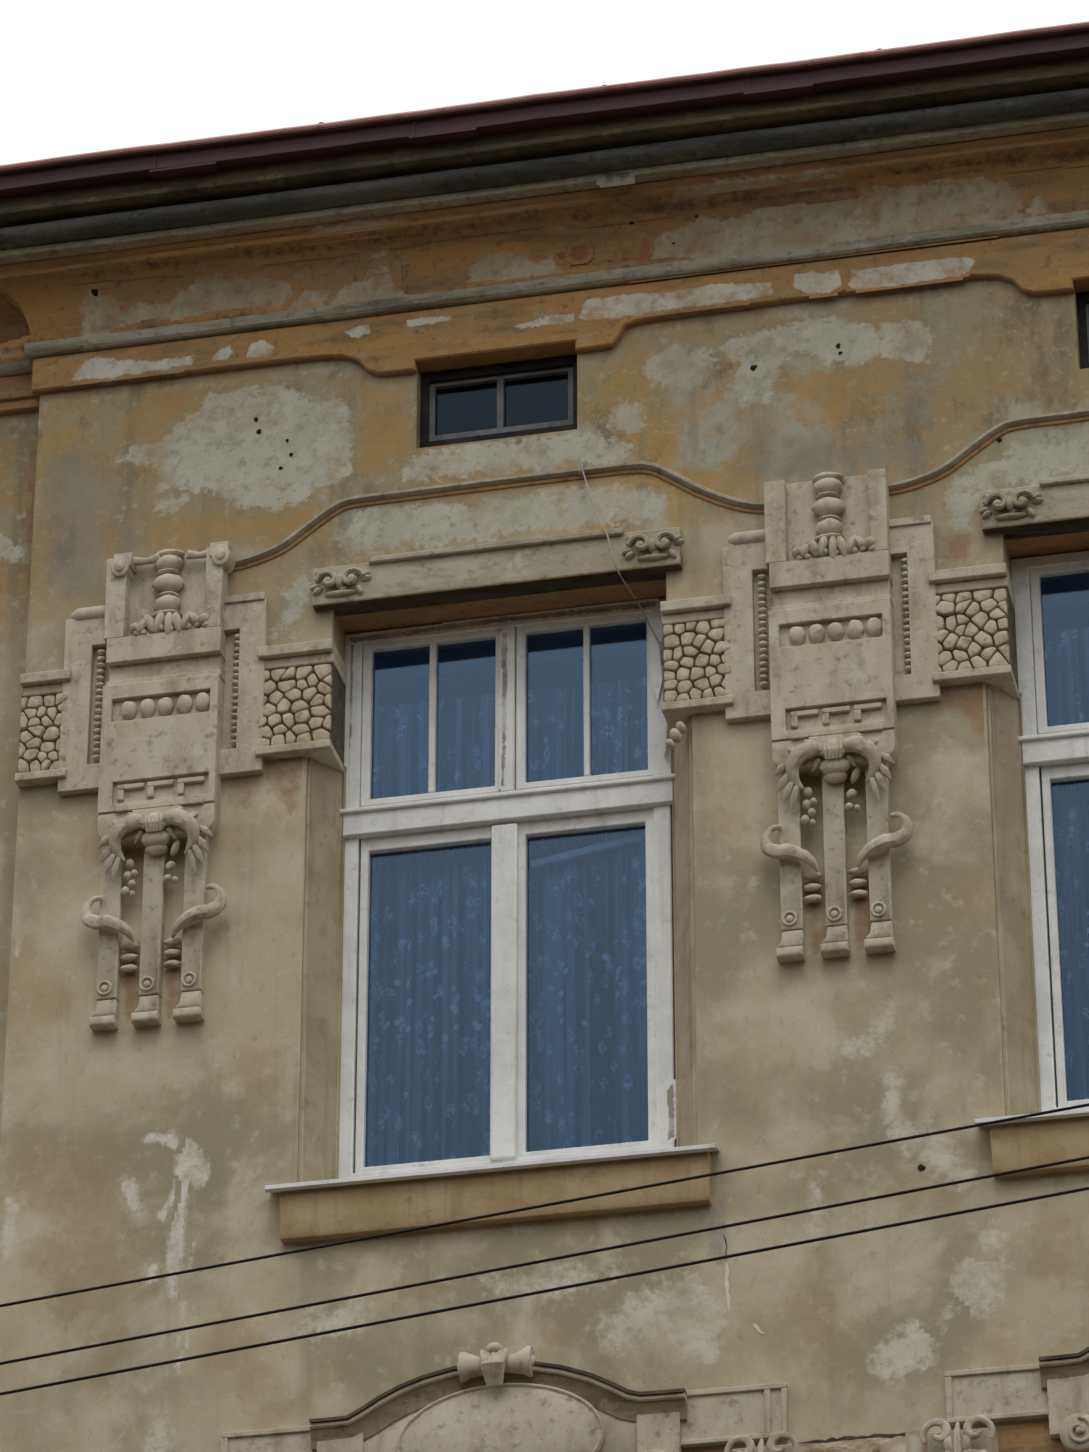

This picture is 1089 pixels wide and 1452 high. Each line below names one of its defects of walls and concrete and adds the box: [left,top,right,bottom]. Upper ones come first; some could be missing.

peeling [0,521,30,567]
peeling [65,213,412,522]
peeling [268,160,1055,646]
water stain [9,1069,215,1428]